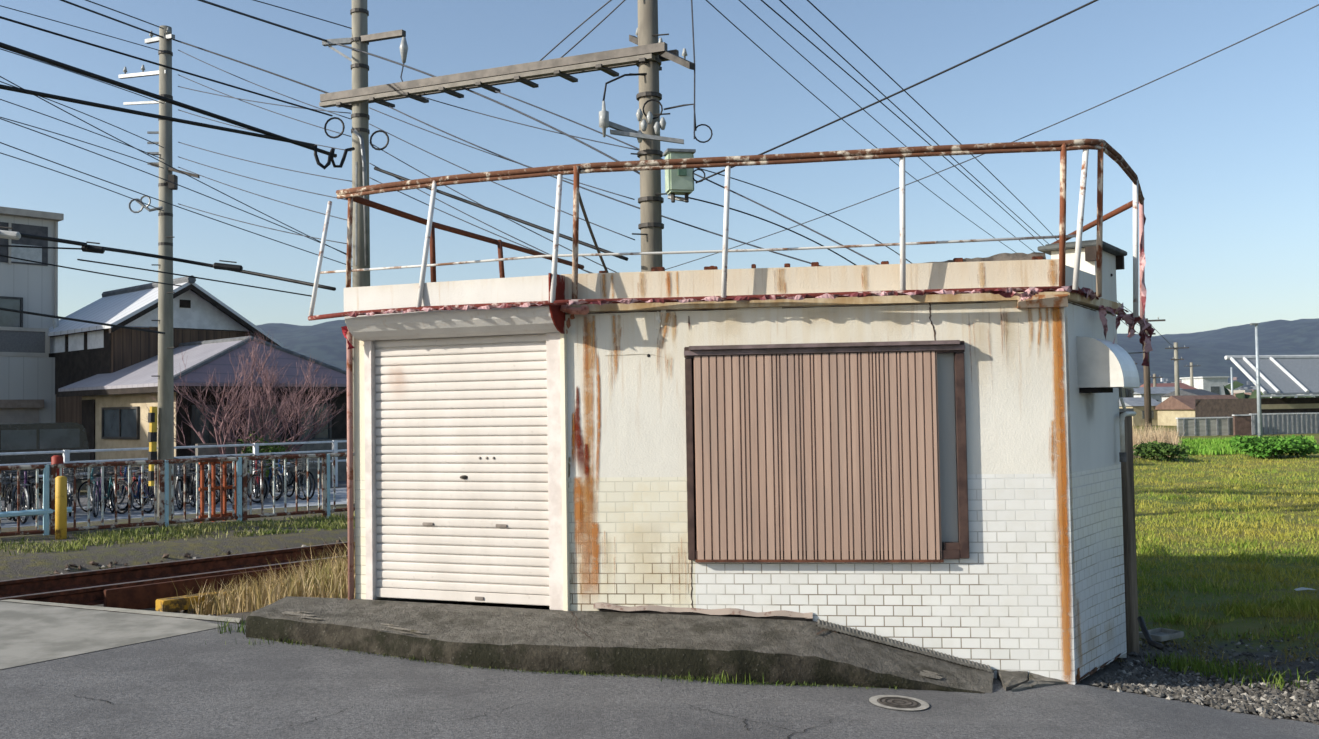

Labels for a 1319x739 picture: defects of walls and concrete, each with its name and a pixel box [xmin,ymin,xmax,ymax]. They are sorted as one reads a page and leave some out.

rust [572,316,617,581]
crack [565,308,734,316]
crack [782,302,995,340]
rust [1038,307,1071,678]